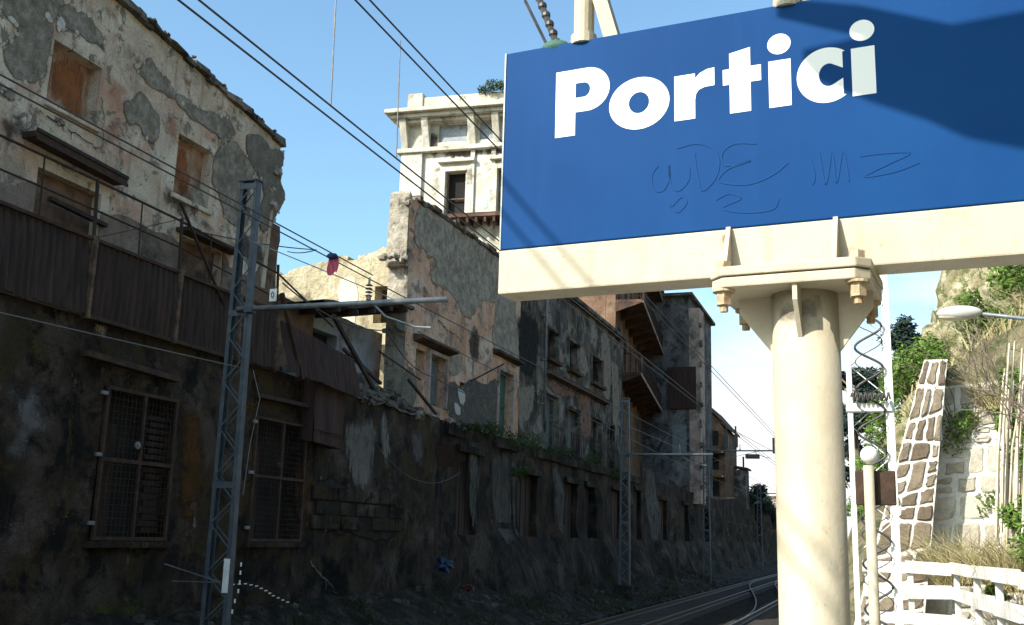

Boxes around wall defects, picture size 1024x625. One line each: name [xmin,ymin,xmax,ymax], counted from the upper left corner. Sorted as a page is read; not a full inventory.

flaking render [0,0,107,131]
flaking render [123,57,285,242]
flaking render [377,197,518,368]
water stain [345,413,390,489]
flaking render [447,354,497,433]